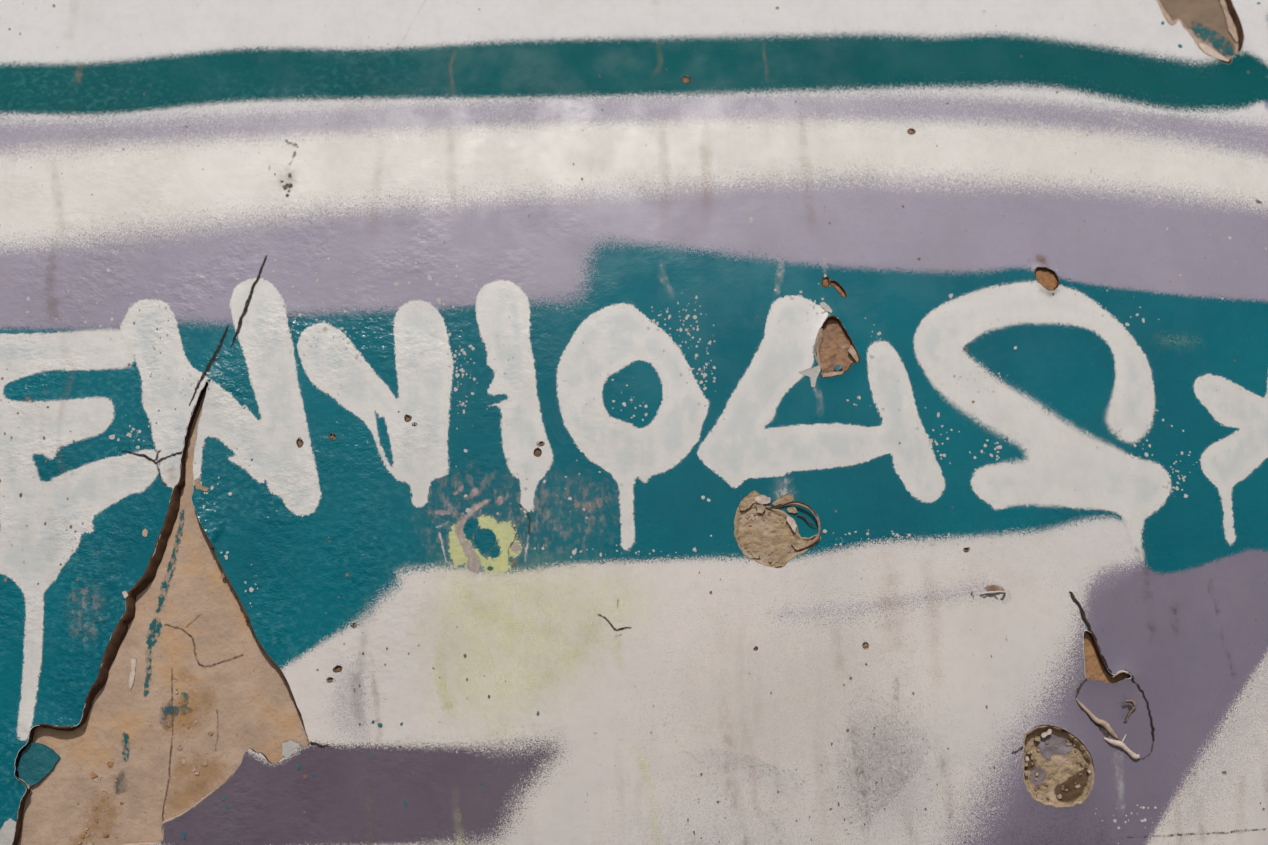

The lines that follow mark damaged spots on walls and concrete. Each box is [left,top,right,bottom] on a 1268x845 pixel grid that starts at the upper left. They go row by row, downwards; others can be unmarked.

peeling [1156,0,1244,64]
peeling [821,274,847,298]
peeling [1035,258,1060,291]
crack [122,256,267,485]
flaking render [799,302,860,388]
flaking render [734,489,821,568]
peeling [0,392,310,845]
peeling [1069,591,1155,760]
flaking render [1012,725,1095,807]